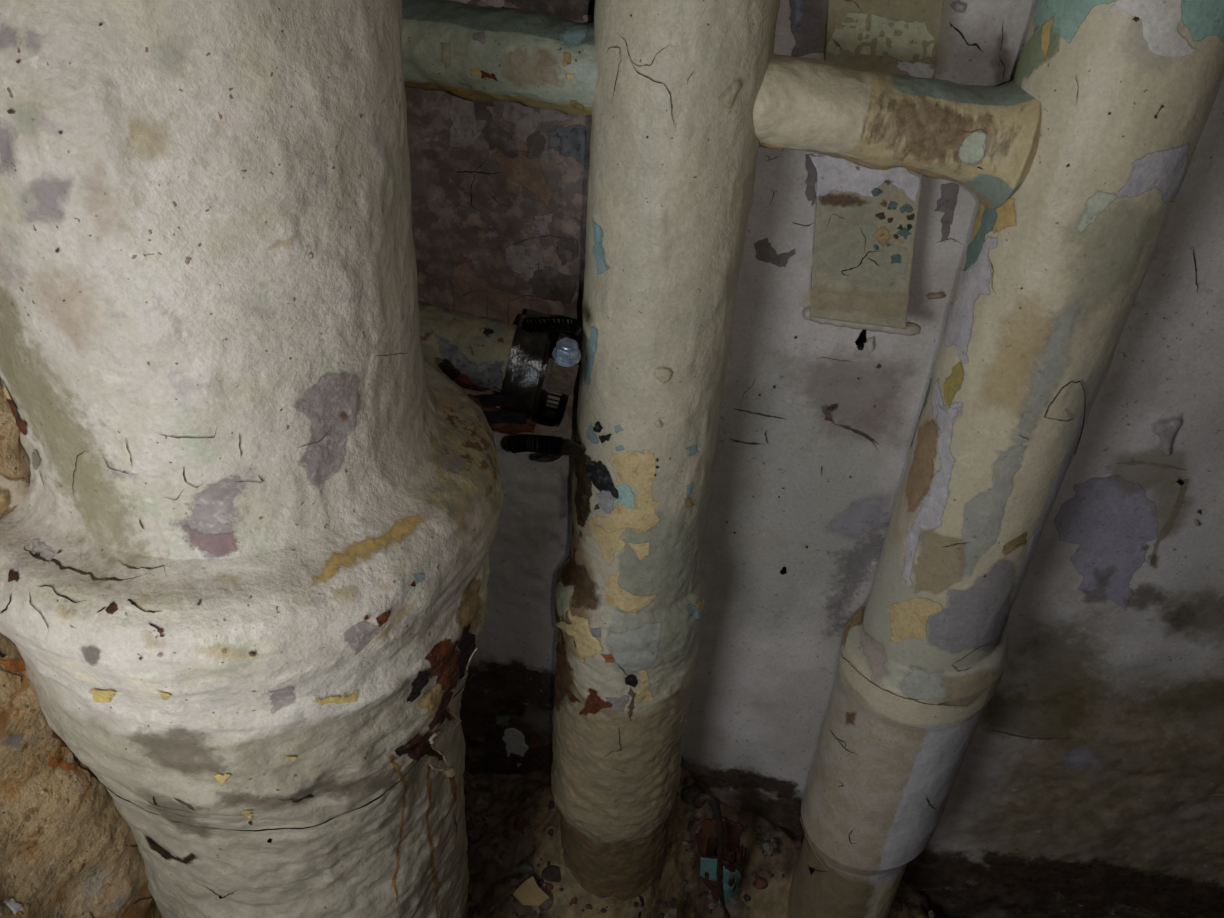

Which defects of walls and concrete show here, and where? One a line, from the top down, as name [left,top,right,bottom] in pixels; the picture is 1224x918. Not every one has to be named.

crack [606,34,694,130]
peeling [959,124,994,169]
flaking render [449,94,590,325]
crack [0,546,165,635]
peeling [555,449,660,712]
peeling [1003,532,1027,555]
corrosion [426,686,453,735]
corrosion [389,755,407,901]
corrosion [426,765,440,918]
water stain [982,851,1224,918]